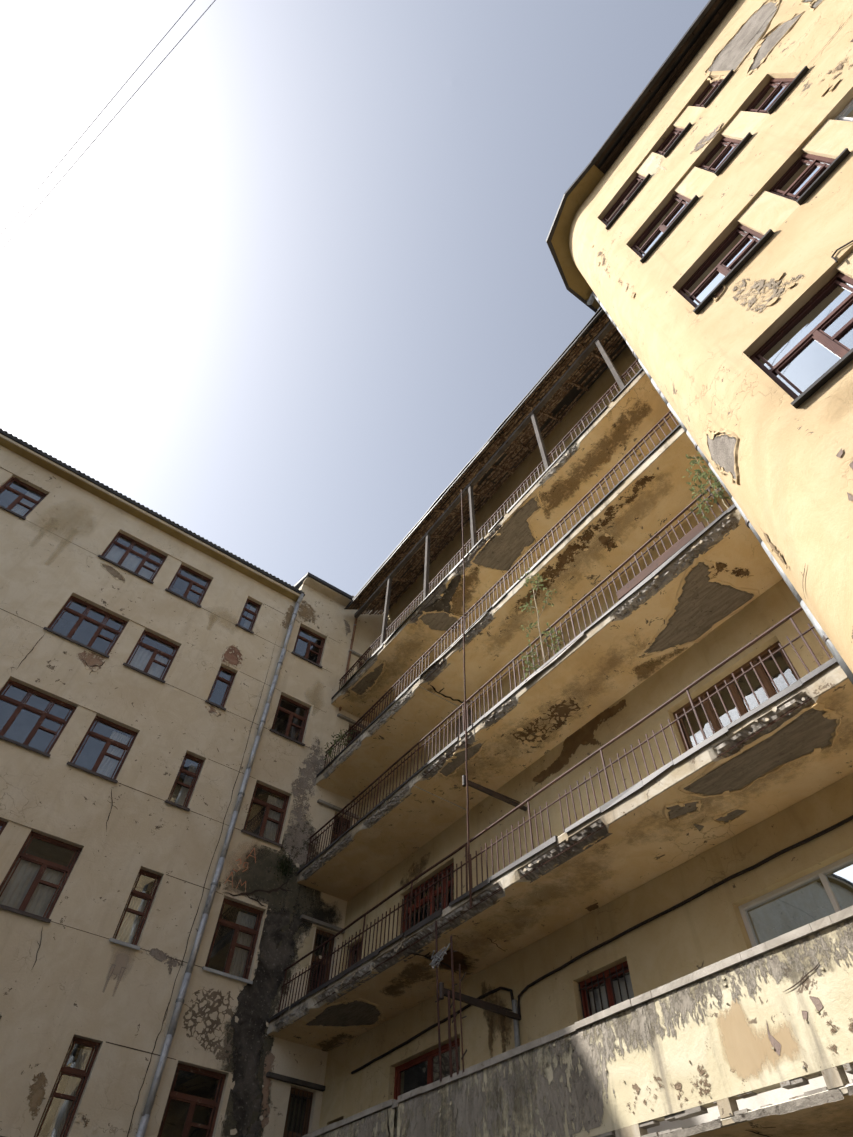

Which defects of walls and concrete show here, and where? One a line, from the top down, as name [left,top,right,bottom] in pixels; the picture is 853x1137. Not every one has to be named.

flaking render [705,0,824,83]
peeling [712,272,803,313]
damp [537,401,651,519]
flaking render [706,428,740,485]
flaking render [410,443,580,652]
flaking render [614,515,760,658]
flaking render [422,696,520,780]
peeling [513,697,627,783]
flaking render [662,692,842,831]
flaking render [181,906,322,1137]
damp [219,816,342,1137]
peeling [431,919,853,1137]